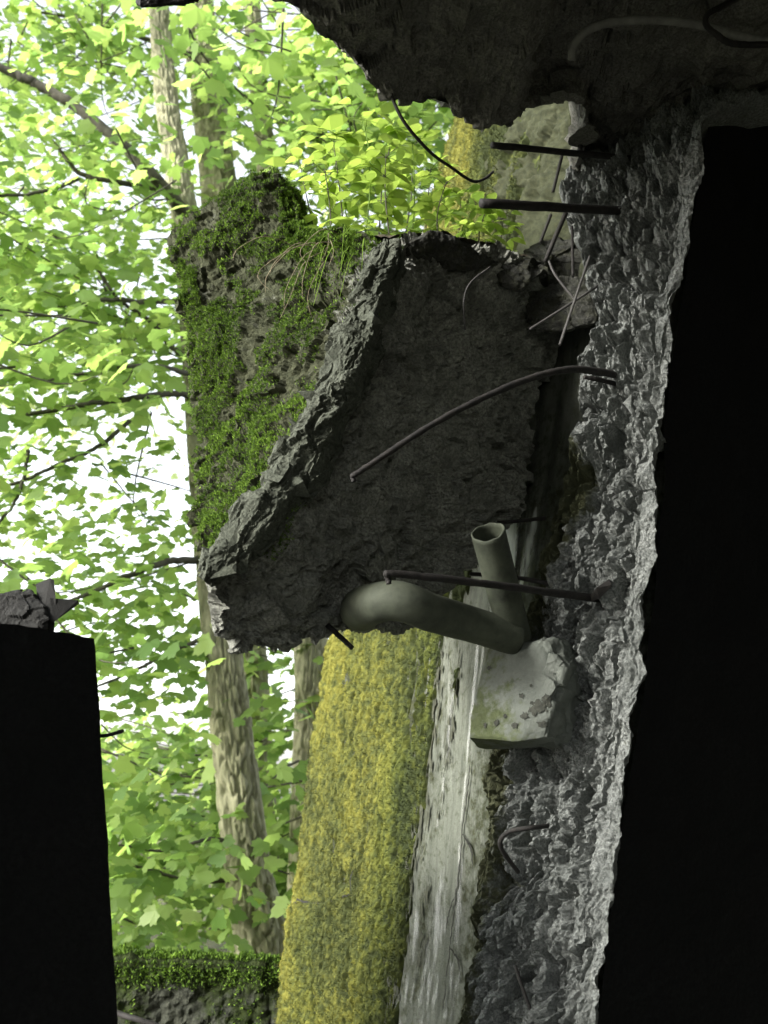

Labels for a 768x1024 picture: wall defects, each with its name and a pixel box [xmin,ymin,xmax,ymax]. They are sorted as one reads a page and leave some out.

spalling [702,0,768,49]
spalling [196,238,406,587]
spalling [325,623,354,650]
spalling [350,85,768,1024]